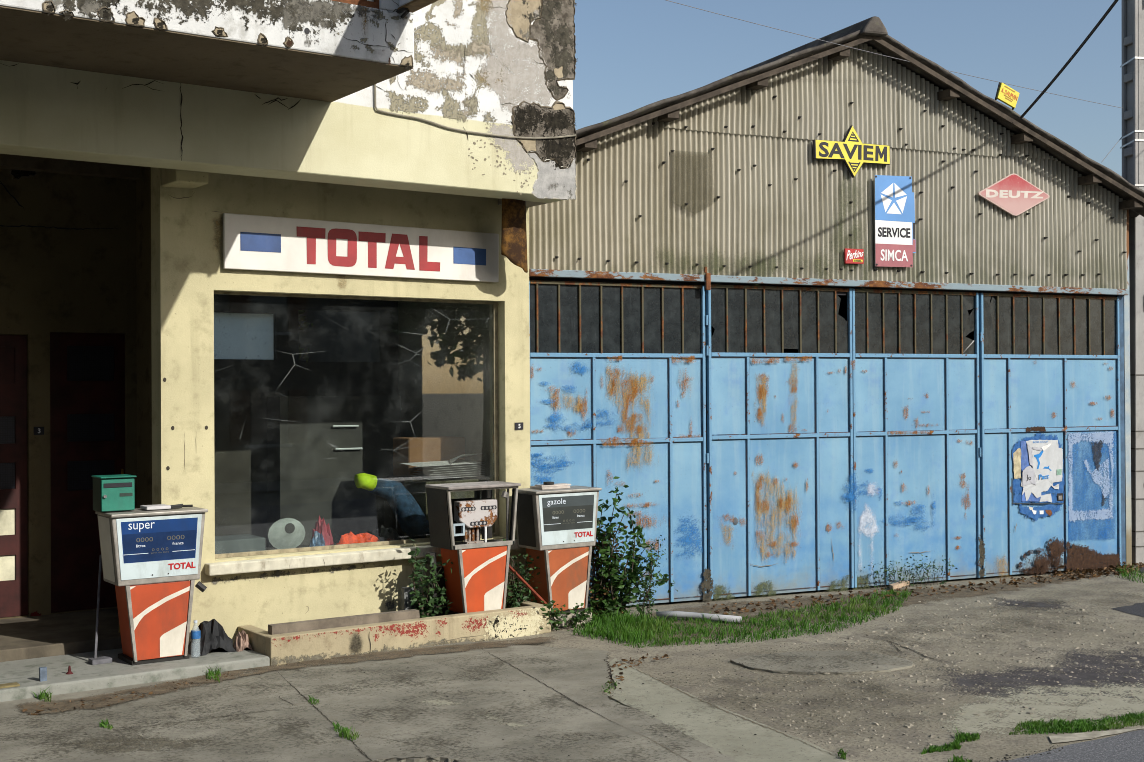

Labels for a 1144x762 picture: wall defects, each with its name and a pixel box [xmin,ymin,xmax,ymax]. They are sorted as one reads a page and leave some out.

spalling [42,0,74,21]
spalling [97,6,168,30]
spalling [212,26,228,39]
spalling [257,33,268,47]
crack [106,80,183,161]
peeling [366,0,578,200]
rust [550,386,588,417]
rust [601,356,653,468]
rust [717,454,808,559]
peeling [1012,432,1117,541]
crack [46,672,465,762]
crack [413,634,835,762]